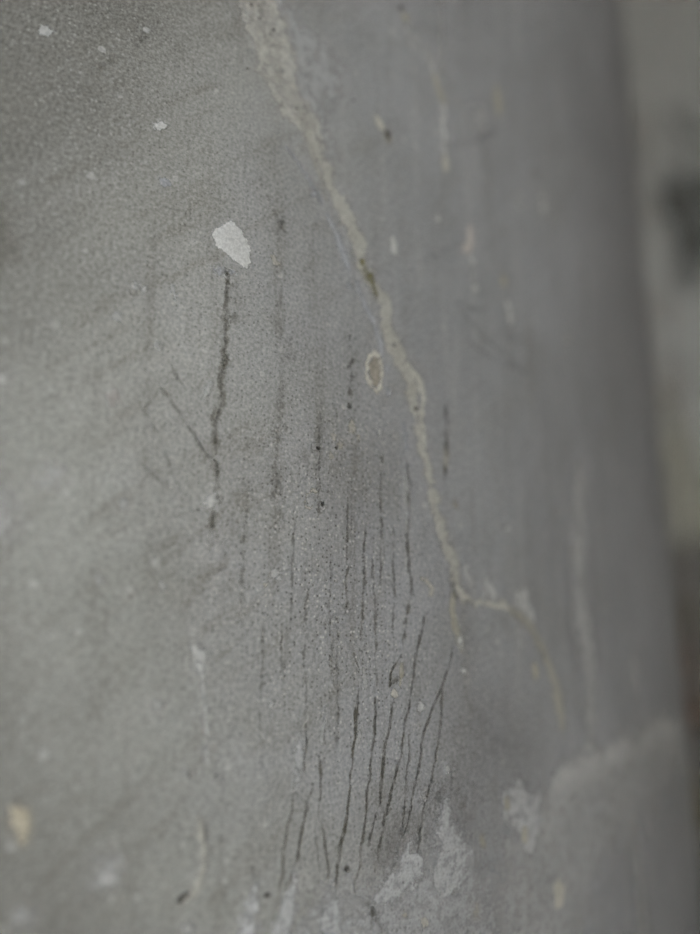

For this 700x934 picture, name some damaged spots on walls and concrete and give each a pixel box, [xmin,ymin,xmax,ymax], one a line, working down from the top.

peeling [211,220,252,269]
spalling [365,349,384,395]
crack [237,0,567,732]